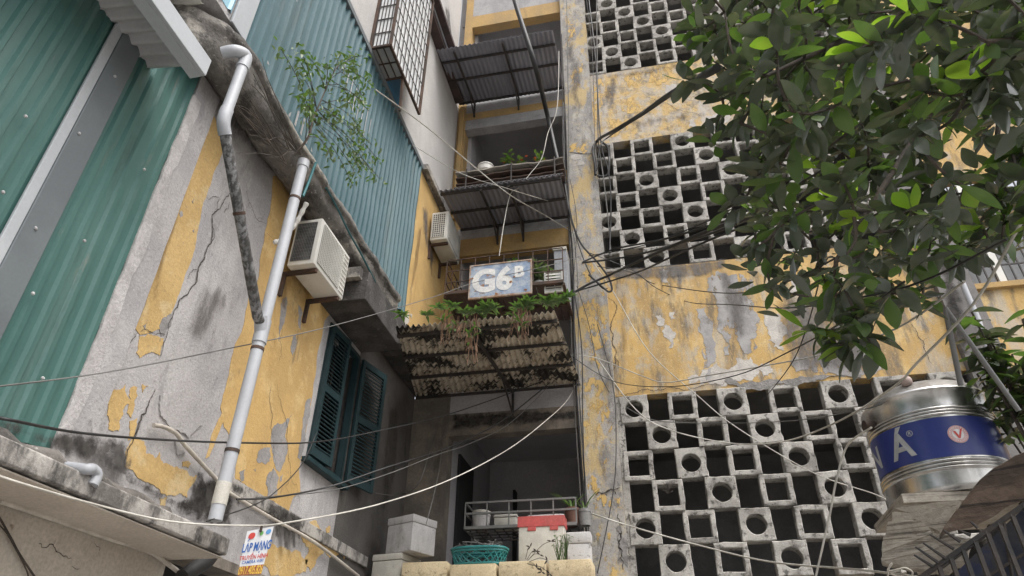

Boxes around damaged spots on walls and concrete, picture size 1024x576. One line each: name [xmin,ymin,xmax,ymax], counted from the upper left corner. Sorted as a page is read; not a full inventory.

peeling [569,142,587,166]
peeling [592,65,677,138]
peeling [689,114,731,127]
peeling [136,117,222,358]
crack [130,191,268,357]
damp [195,292,218,332]
peeling [206,176,330,510]
peeling [655,312,676,348]
peeling [686,271,884,391]
damp [37,434,243,524]
crack [126,391,155,456]
peeling [107,384,197,506]